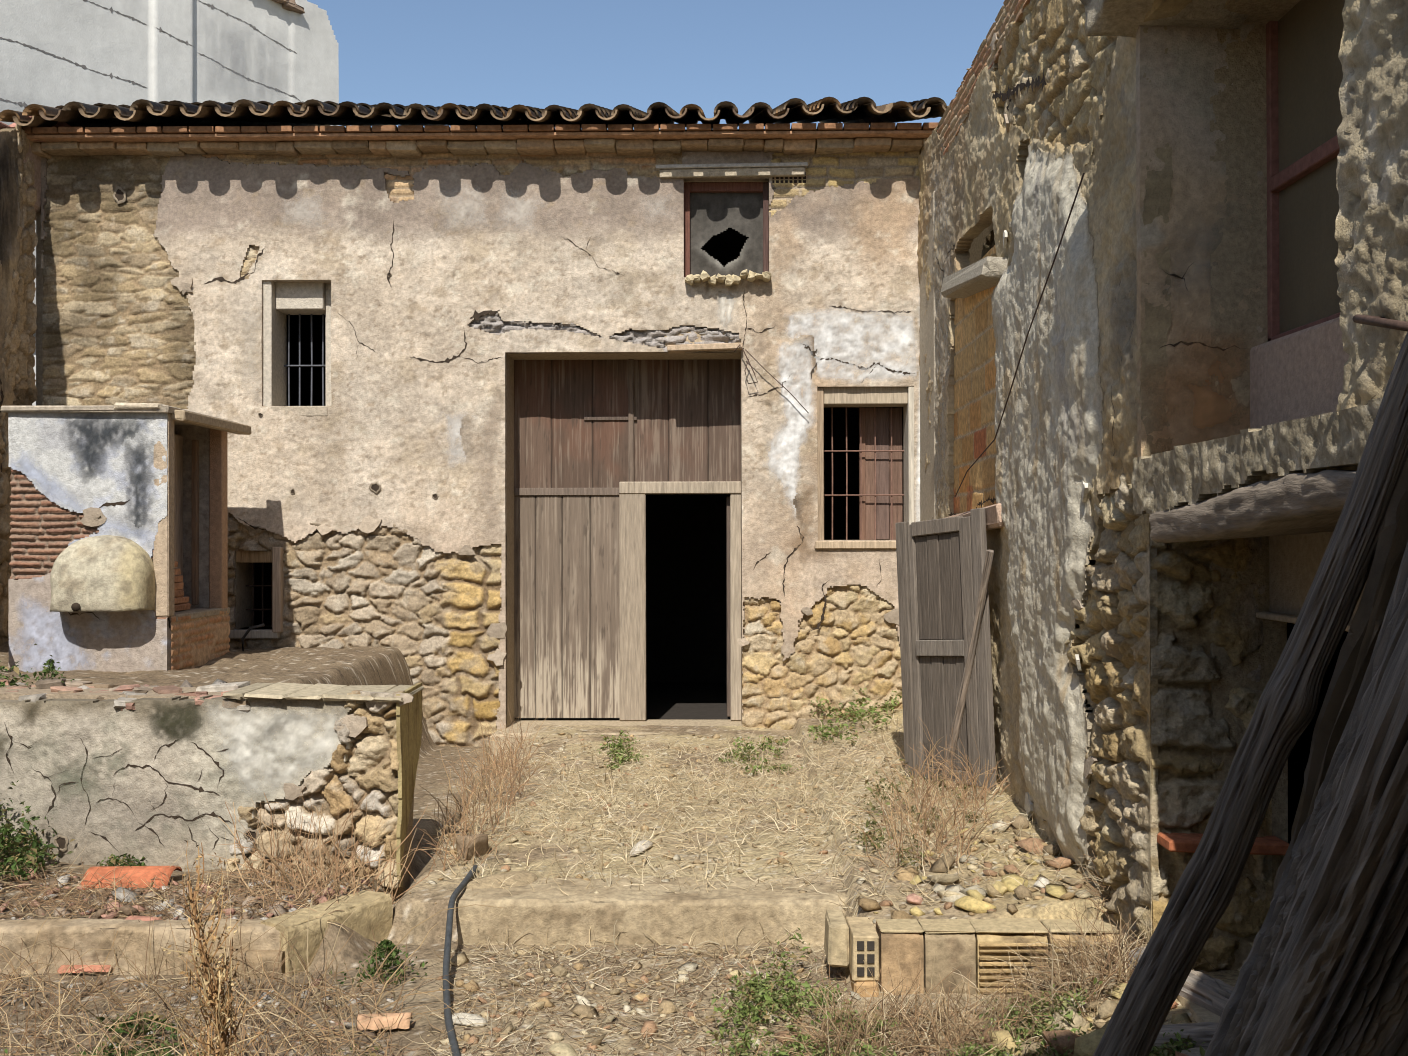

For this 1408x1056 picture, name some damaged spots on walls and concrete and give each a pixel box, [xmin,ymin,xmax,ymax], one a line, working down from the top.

flaking render [202,152,682,203]
flaking render [0,115,196,671]
crack [742,291,916,397]
leakage [70,420,146,528]
flaking render [221,513,507,900]
flaking render [737,584,903,730]
flaking render [1065,472,1159,950]
crack [5,725,232,854]